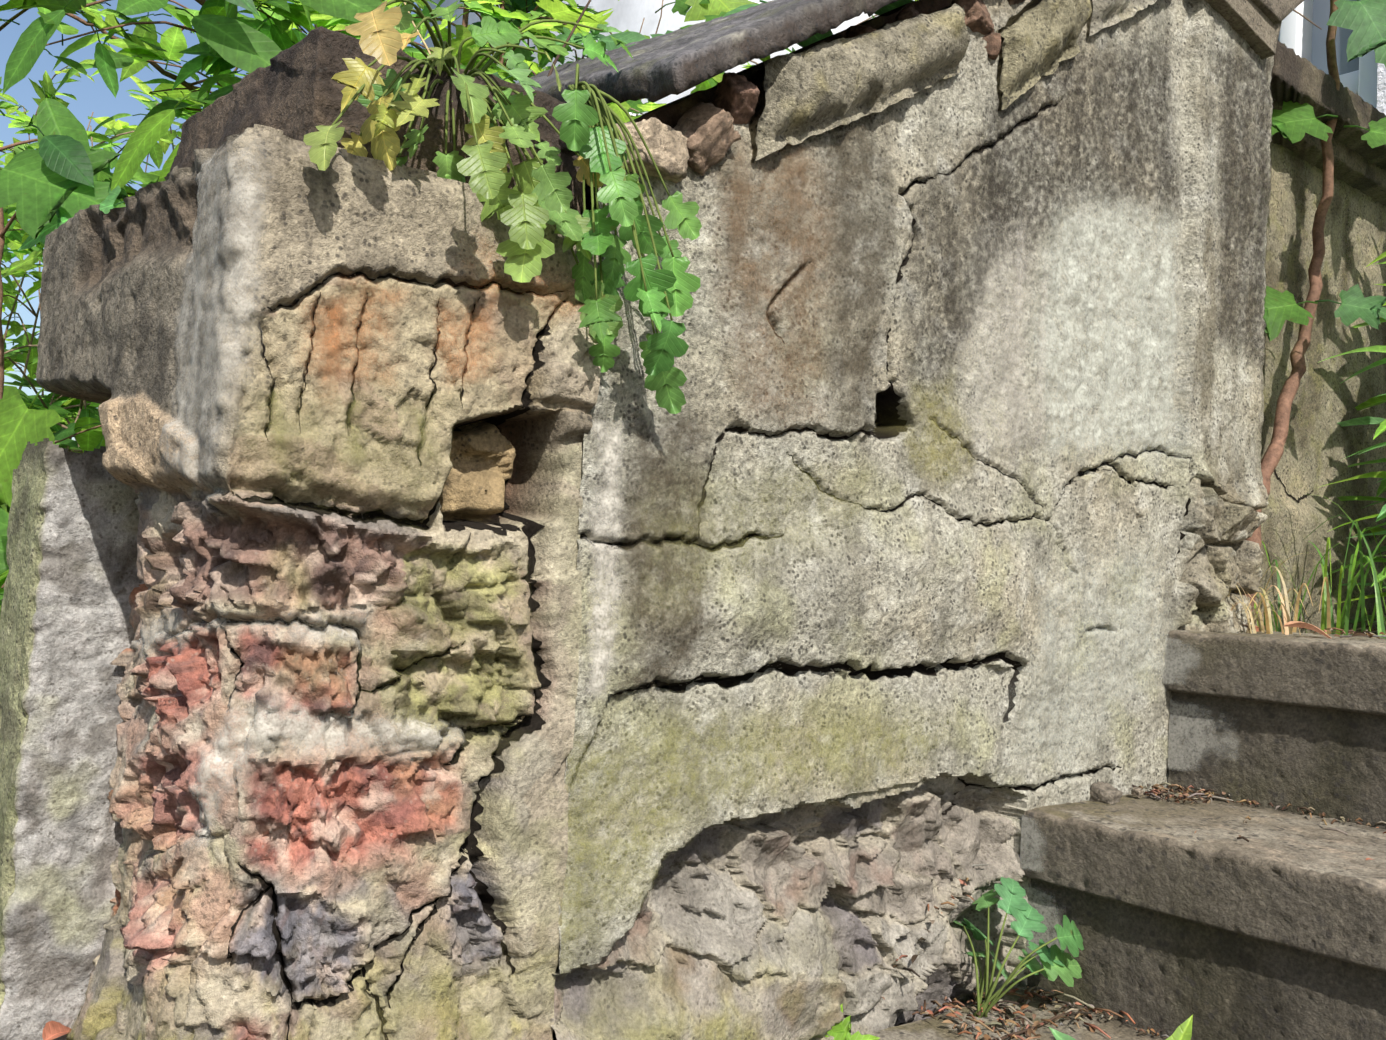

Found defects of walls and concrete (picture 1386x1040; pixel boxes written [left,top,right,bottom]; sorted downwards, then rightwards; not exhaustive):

crack [259,272,568,466]
crack [580,98,1192,579]
crack [227,480,552,1040]
spalling [0,275,1028,1040]
crack [611,652,1022,723]
crack [937,766,1122,848]